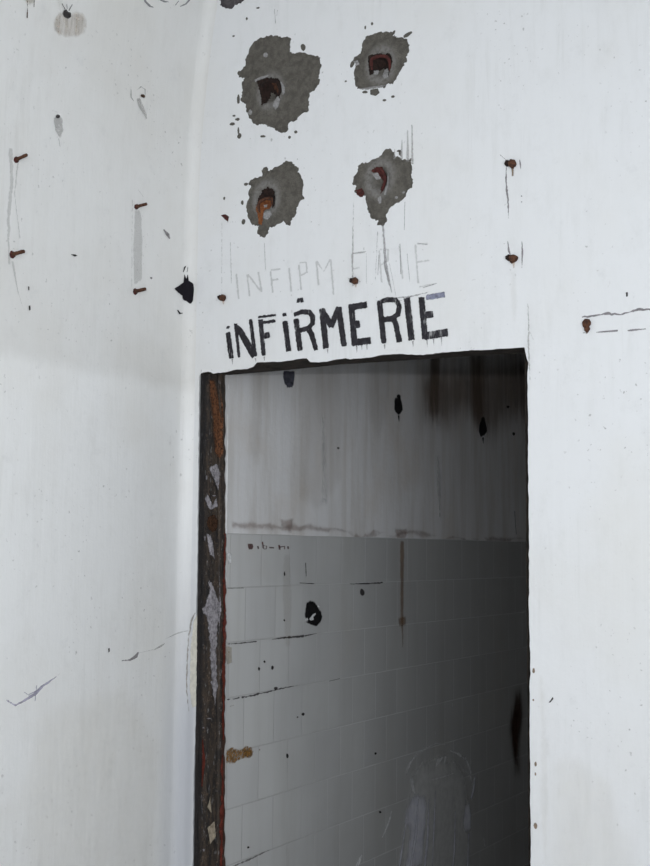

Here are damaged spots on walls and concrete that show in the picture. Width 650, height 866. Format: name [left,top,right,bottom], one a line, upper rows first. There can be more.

spalling [220,0,244,9]
spalling [230,35,322,139]
spalling [345,22,412,101]
spalling [241,161,304,238]
spalling [352,149,413,226]
corrosion [210,380,224,458]
corrosion [219,533,260,866]